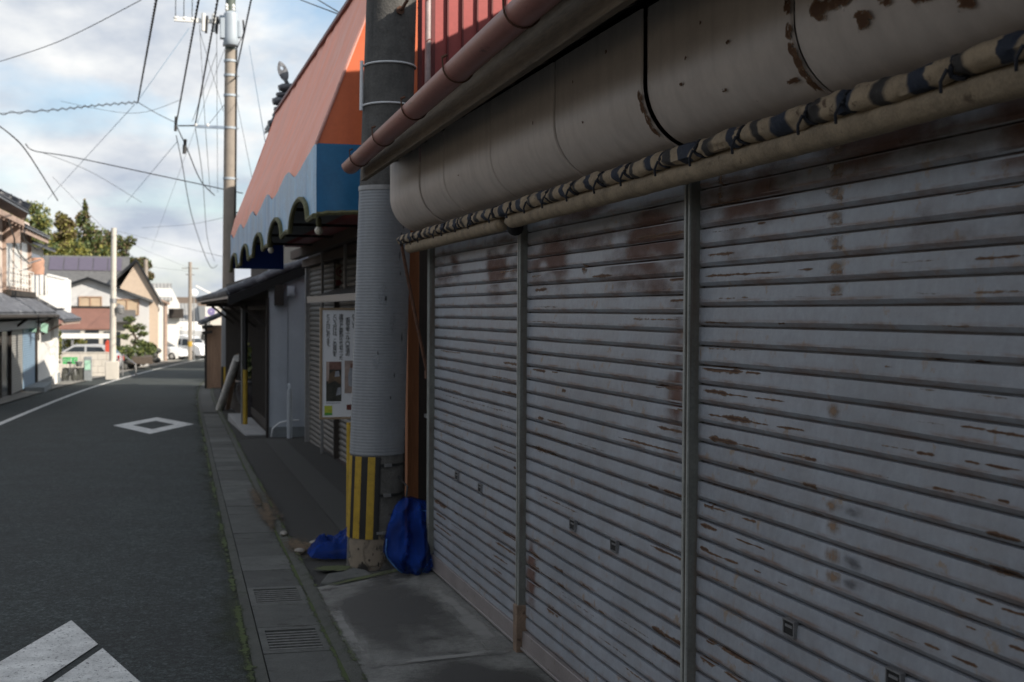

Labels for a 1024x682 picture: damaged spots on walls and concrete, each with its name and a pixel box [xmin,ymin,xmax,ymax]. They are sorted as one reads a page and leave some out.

rust [809,0,873,30]
rust [957,0,976,9]
rust [783,0,823,91]
rust [711,175,785,232]
rust [582,210,684,291]
rust [702,365,761,374]
rust [705,389,784,402]
rust [709,414,804,431]
rust [961,425,1024,437]
rust [965,460,1018,470]
rust [923,545,1023,578]
rust [700,639,755,682]